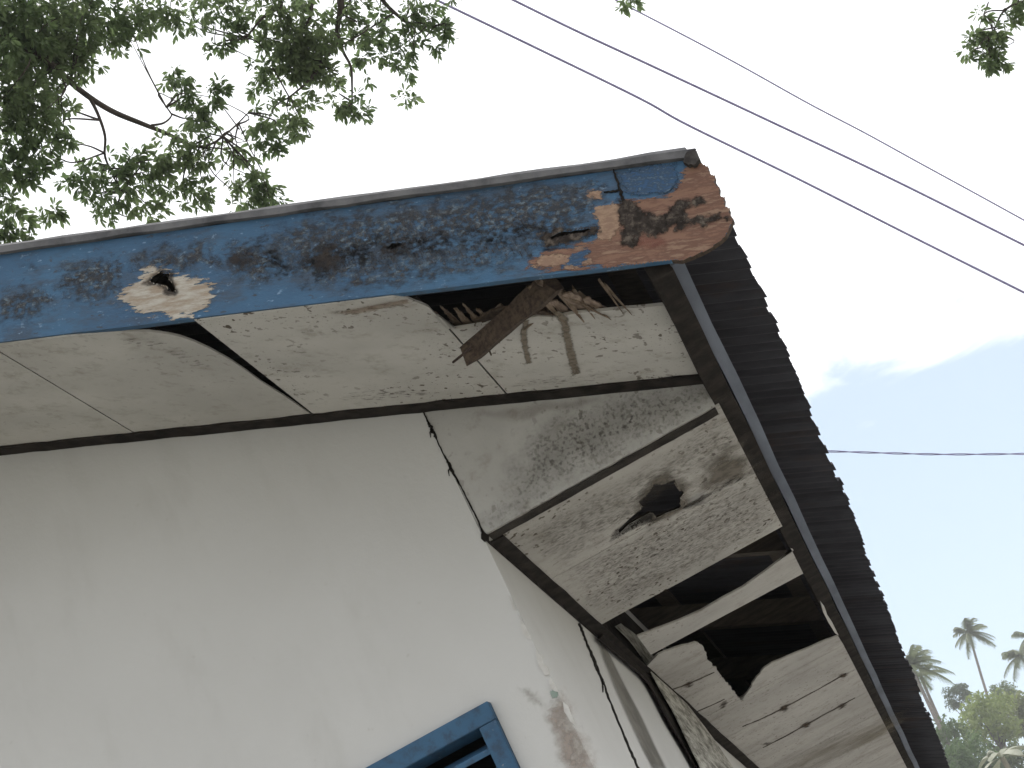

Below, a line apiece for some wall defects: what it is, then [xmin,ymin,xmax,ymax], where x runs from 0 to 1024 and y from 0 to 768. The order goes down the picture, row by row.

peeling [60,162,733,321]
crack [423,412,490,542]
water stain [612,444,747,544]
crack [578,623,639,768]